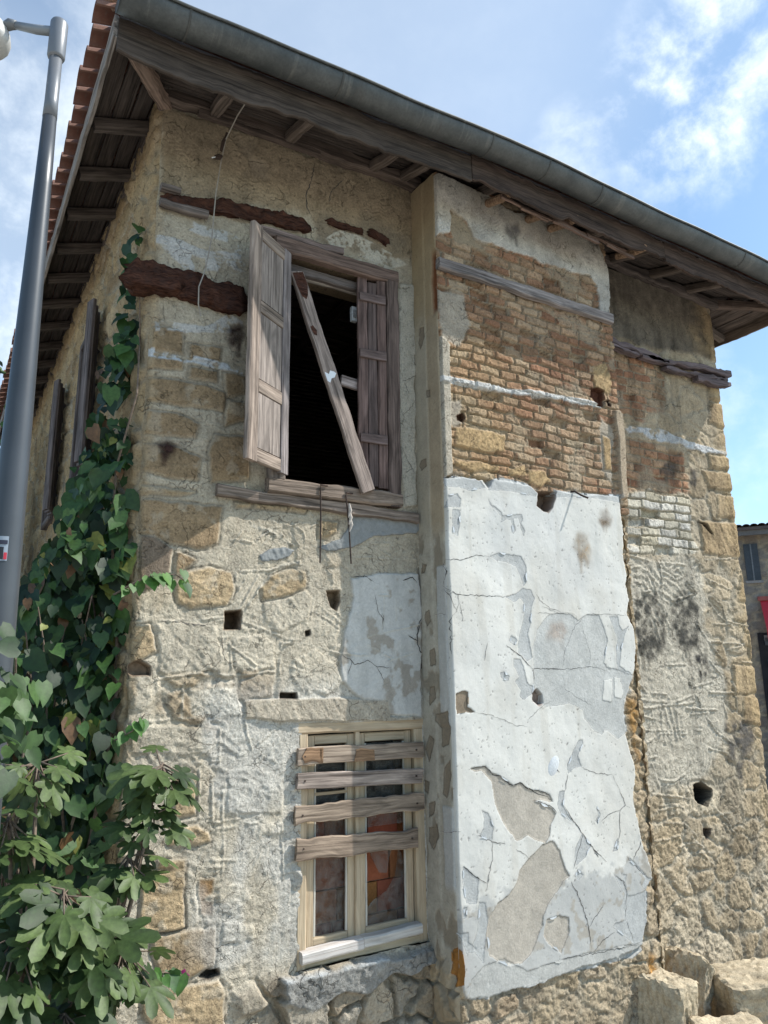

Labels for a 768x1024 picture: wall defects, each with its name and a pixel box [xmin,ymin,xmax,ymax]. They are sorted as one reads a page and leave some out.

crack [483,594,624,727]
flaking render [491,552,633,739]
mould [634,594,706,673]
flaking render [567,740,583,773]
crack [442,831,530,887]
flaking render [451,766,651,1000]
crack [471,766,645,965]